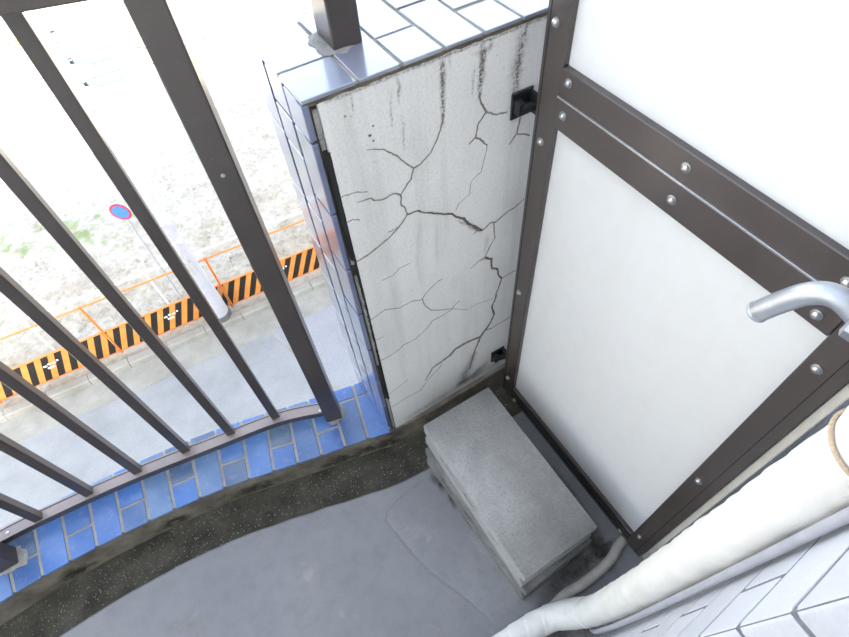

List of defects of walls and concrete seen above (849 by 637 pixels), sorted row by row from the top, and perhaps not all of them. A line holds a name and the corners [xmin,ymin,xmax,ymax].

leakage [441,26,526,116]
crack [342,94,530,407]